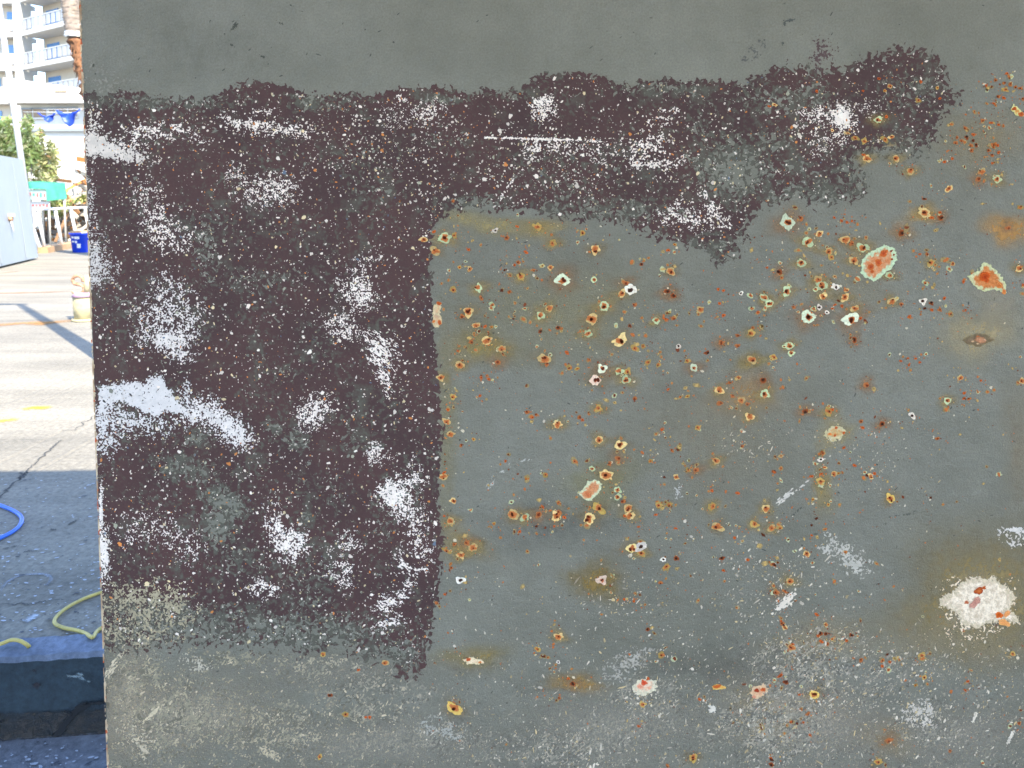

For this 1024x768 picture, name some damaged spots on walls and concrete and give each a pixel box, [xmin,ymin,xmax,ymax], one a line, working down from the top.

peeling [84,35,1002,682]
rust [432,70,1024,746]